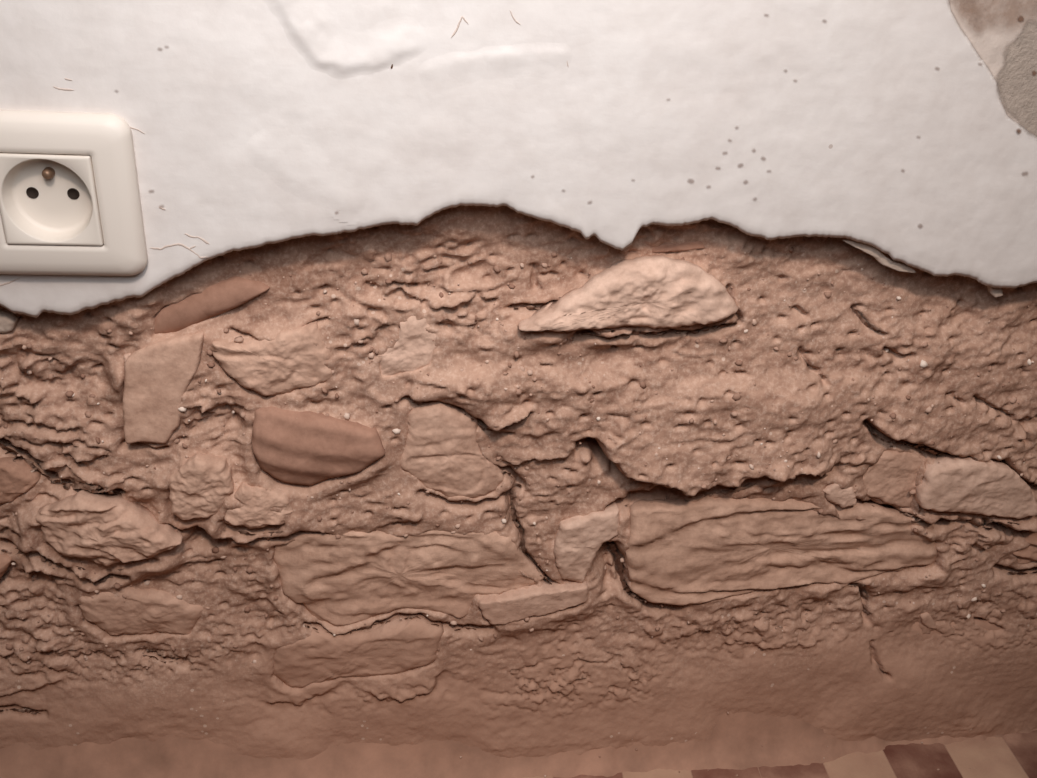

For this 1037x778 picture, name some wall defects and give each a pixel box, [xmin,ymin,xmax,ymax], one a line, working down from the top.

peeling [949,0,1037,136]
spalling [0,205,1037,760]